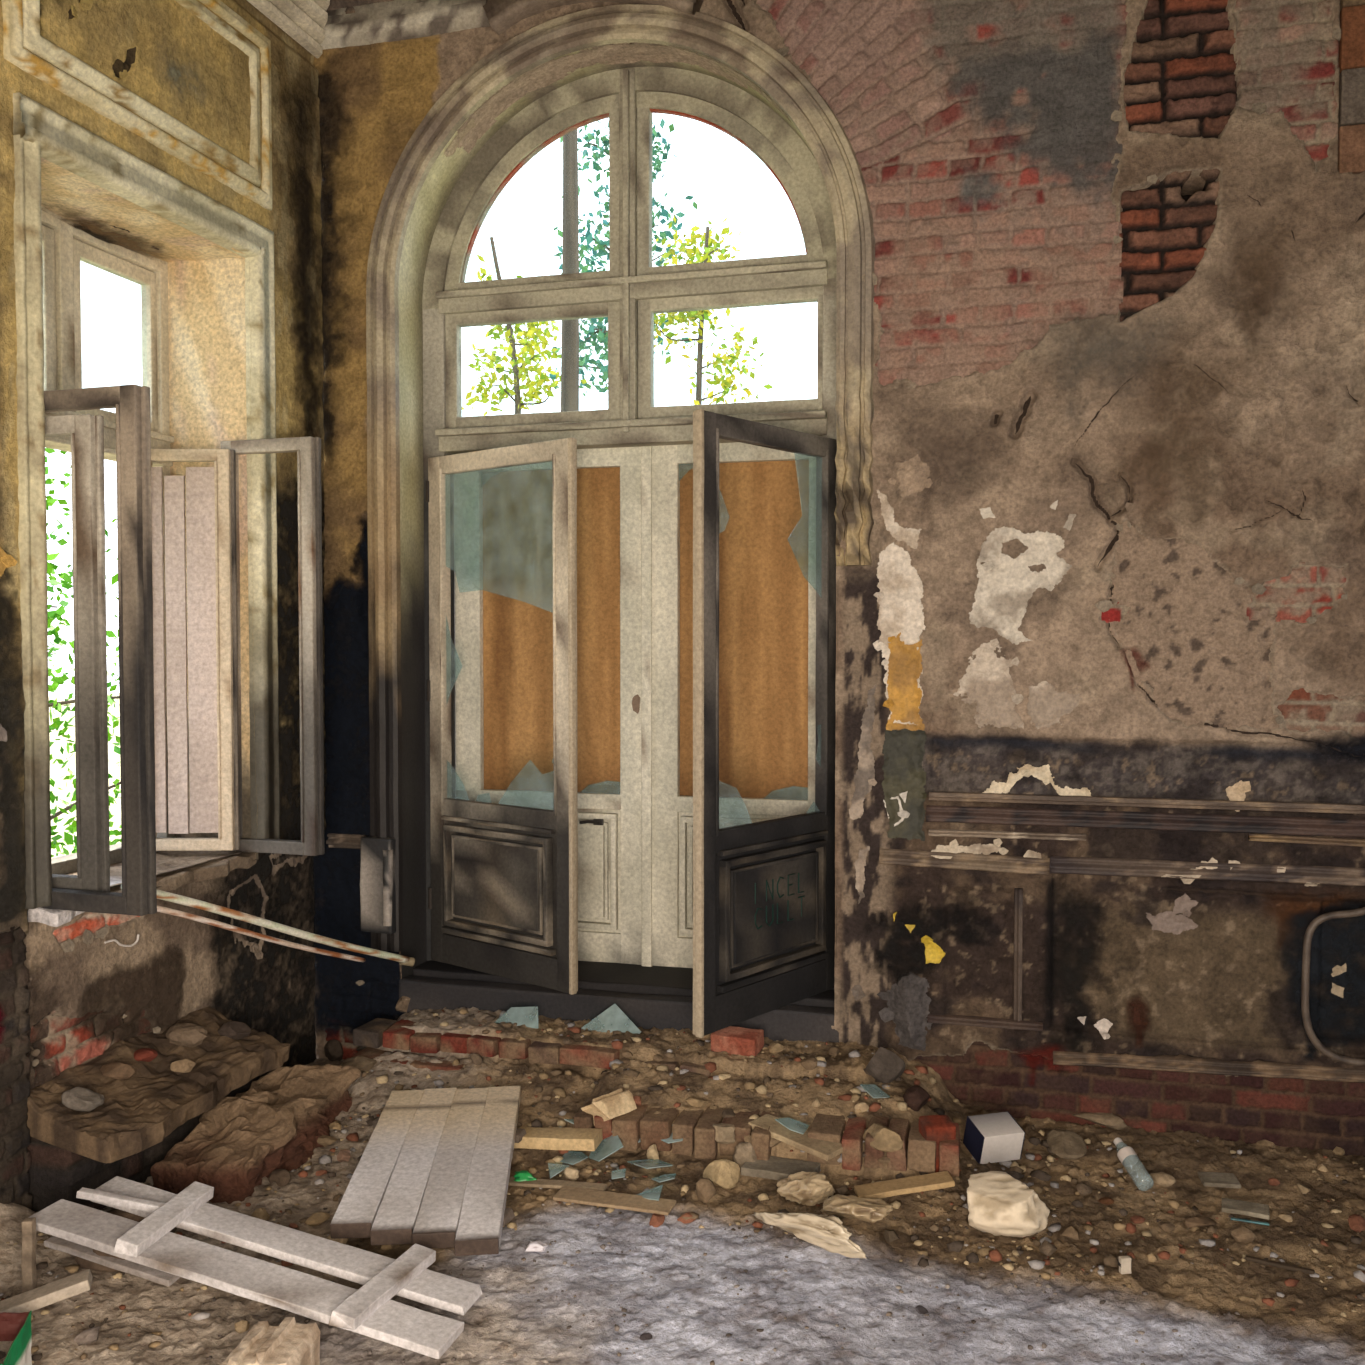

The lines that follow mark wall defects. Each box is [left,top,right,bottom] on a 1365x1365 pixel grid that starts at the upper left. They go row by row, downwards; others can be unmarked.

damp [284,83,331,431]
spalling [756,0,1237,388]
damp [353,519,369,641]
peeling [849,490,1042,859]
peeling [953,500,1082,729]
crack [1075,376,1134,646]
spalling [1095,521,1365,737]
crack [1231,490,1311,532]
crack [1204,723,1365,757]
peeling [855,846,870,904]
flaking render [0,926,119,1210]
damp [1305,1001,1315,1060]